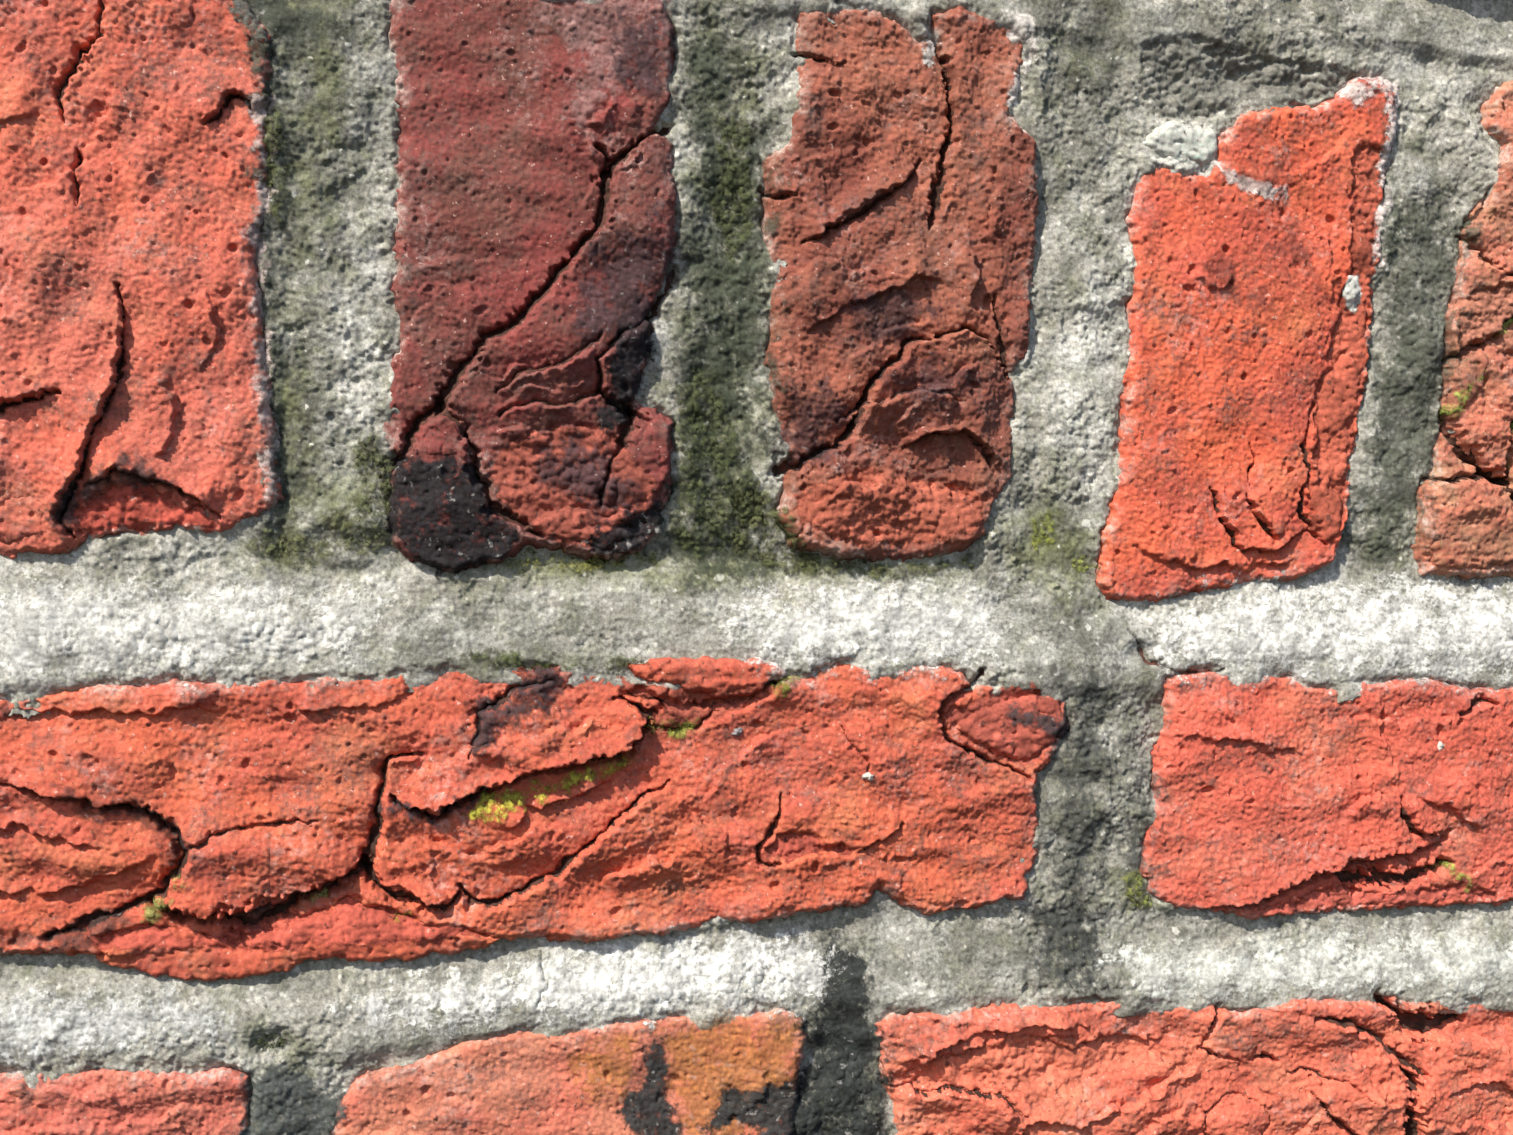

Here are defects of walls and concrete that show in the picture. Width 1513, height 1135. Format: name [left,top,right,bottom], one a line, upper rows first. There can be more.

water stain [1002,10,1036,111]
crack [813,52,954,240]
crack [390,127,675,535]
water stain [659,1,1020,680]
crack [772,312,1009,476]
crack [1212,429,1324,553]
crack [1419,416,1513,501]
crack [44,683,700,939]
crack [1260,806,1443,902]
water stain [325,924,895,1135]
crack [1199,1002,1356,1135]
crack [1314,993,1458,1135]